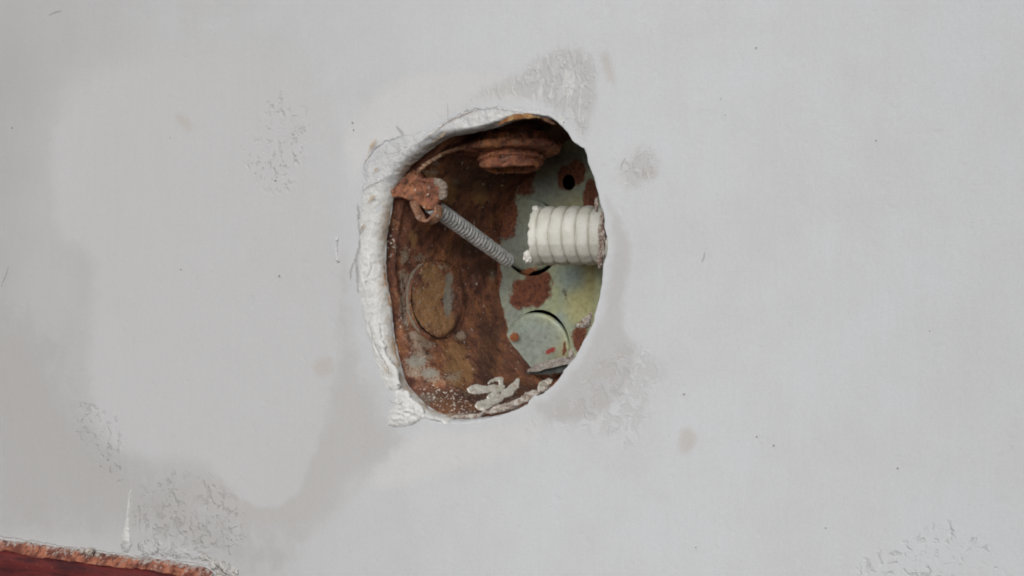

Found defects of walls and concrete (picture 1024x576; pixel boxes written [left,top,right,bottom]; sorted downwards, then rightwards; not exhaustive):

corrosion [499,113,554,124]
spalling [122,463,252,576]